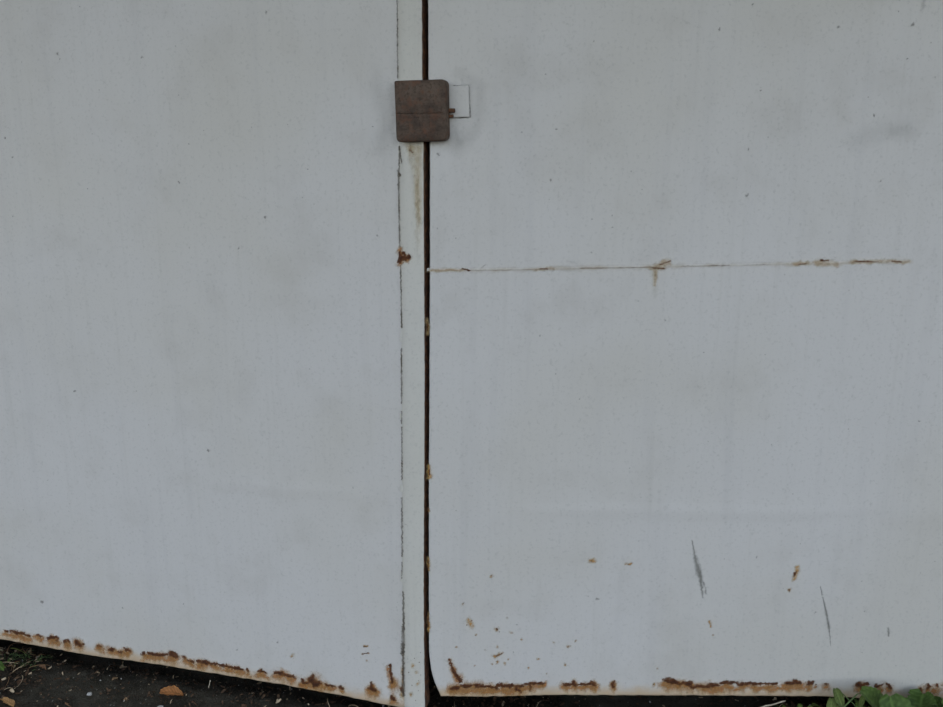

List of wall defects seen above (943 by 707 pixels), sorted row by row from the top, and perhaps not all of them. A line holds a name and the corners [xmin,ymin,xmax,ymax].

rust [397,248,411,266]
rust [2,629,84,648]
rust [95,645,344,693]
rust [366,652,421,704]
rust [447,659,547,696]
rust [560,680,599,692]
rust [653,677,829,694]
rust [854,681,892,693]